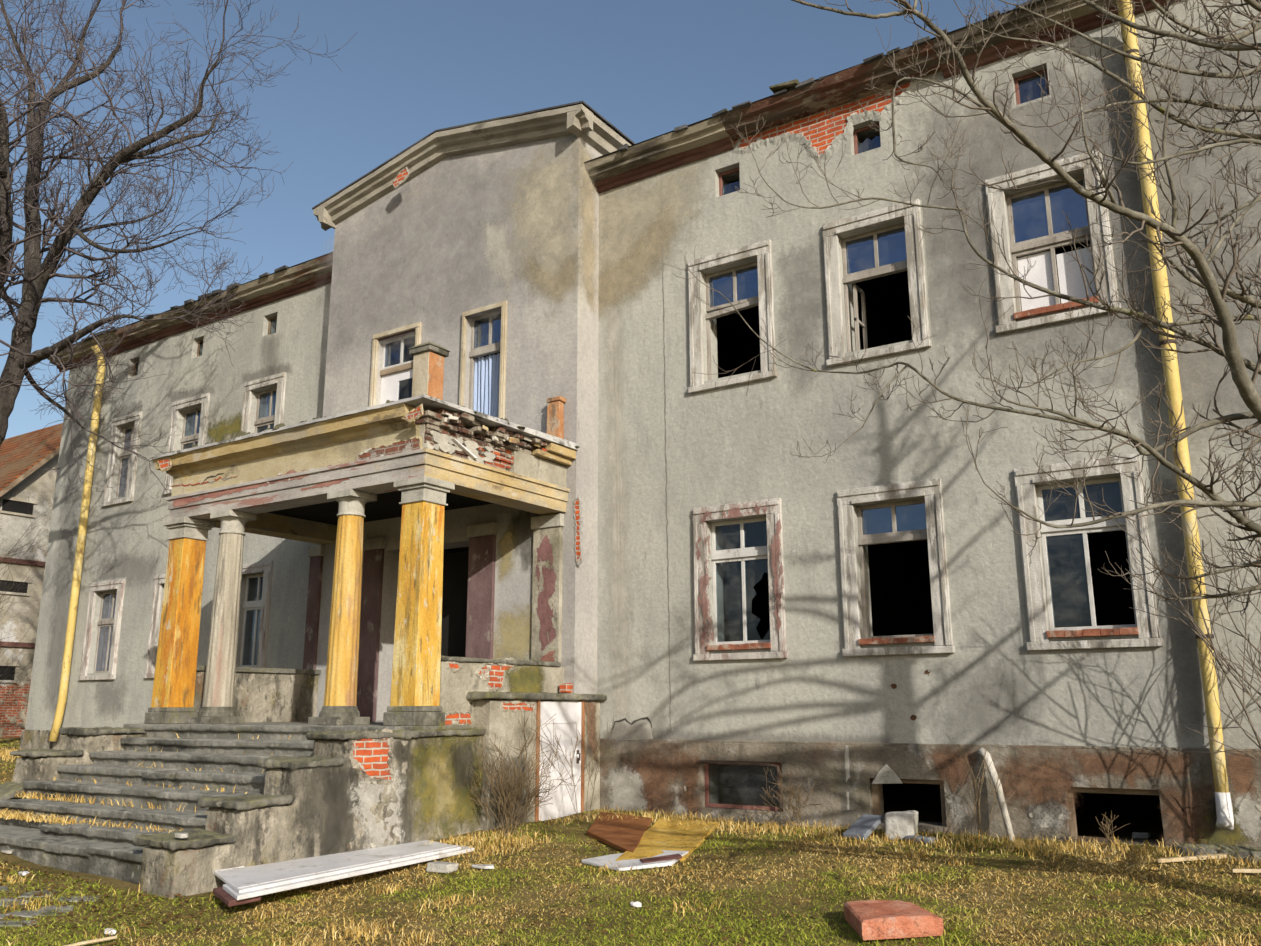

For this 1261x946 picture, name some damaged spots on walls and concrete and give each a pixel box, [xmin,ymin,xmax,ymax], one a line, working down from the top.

flaking render [732,80,917,162]
flaking render [392,167,409,189]
spalling [173,403,547,507]
damp [340,141,695,713]
peeling [536,535,557,662]
spalling [572,497,584,566]
peeling [696,504,784,646]
flaking render [0,678,31,737]
flaking render [446,657,537,714]
flaking render [347,728,406,849]